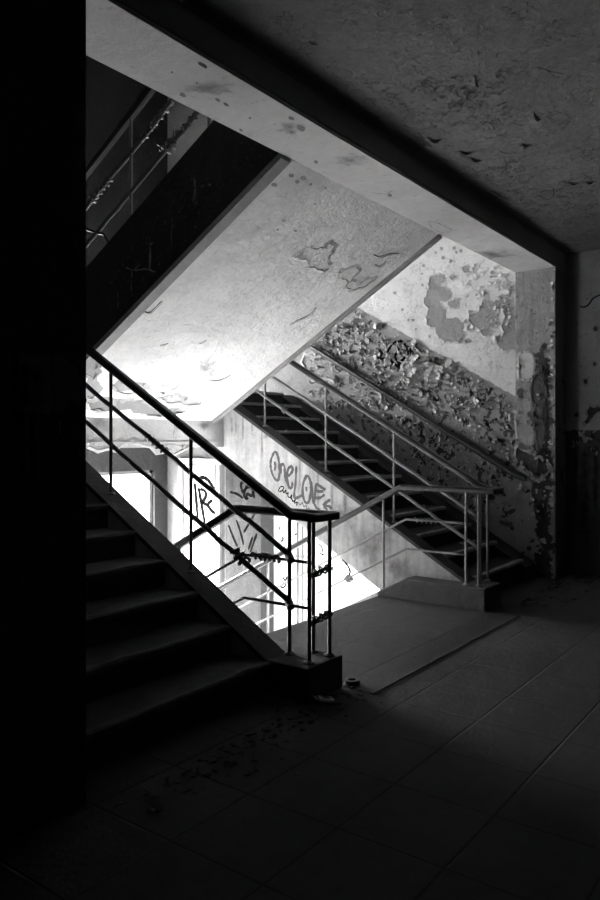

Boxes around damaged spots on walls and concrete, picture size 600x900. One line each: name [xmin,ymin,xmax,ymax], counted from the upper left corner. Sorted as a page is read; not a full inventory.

peeling [291,239,399,293]
spalling [86,355,201,418]
peeling [300,246,555,571]